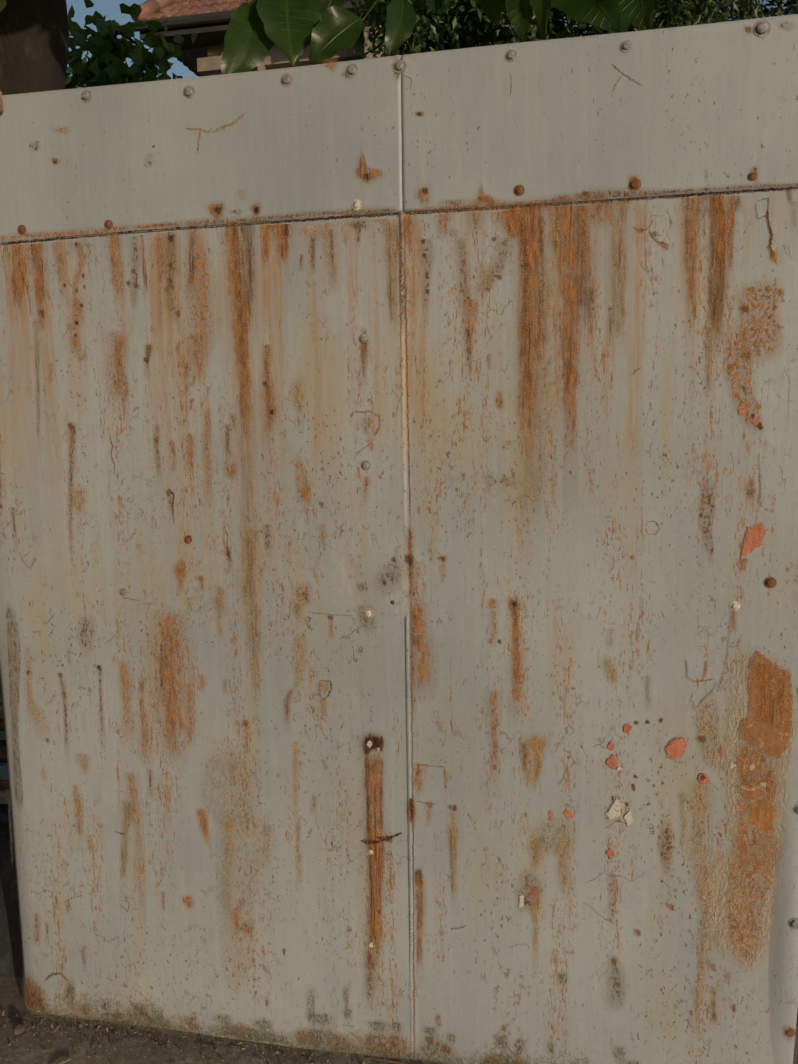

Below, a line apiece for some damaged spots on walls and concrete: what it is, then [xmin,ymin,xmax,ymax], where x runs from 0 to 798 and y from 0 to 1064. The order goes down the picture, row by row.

corrosion [357,155,380,182]
corrosion [1,168,798,529]
peeling [739,522,769,569]
corrosion [120,616,203,757]
corrosion [365,757,383,1000]
corrosion [406,528,446,1055]
corrosion [490,599,522,703]
peeling [665,737,689,761]
corrosion [681,651,795,1020]